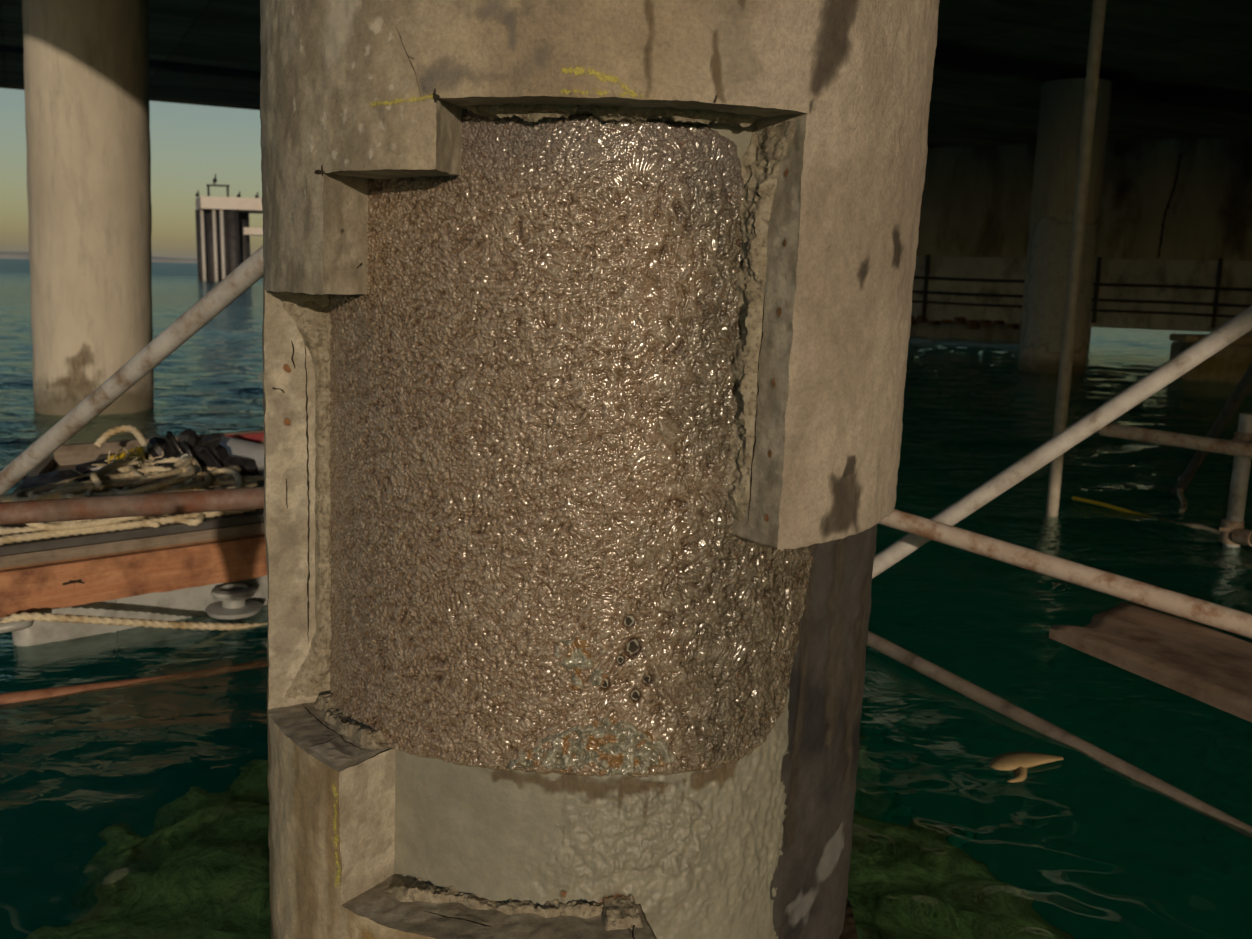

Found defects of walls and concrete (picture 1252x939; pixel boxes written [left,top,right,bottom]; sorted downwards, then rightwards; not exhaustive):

peeling [325,0,401,68]
leakage [810,0,858,111]
spalling [281,84,814,778]
leakage [785,456,869,846]
spalling [381,878,644,931]